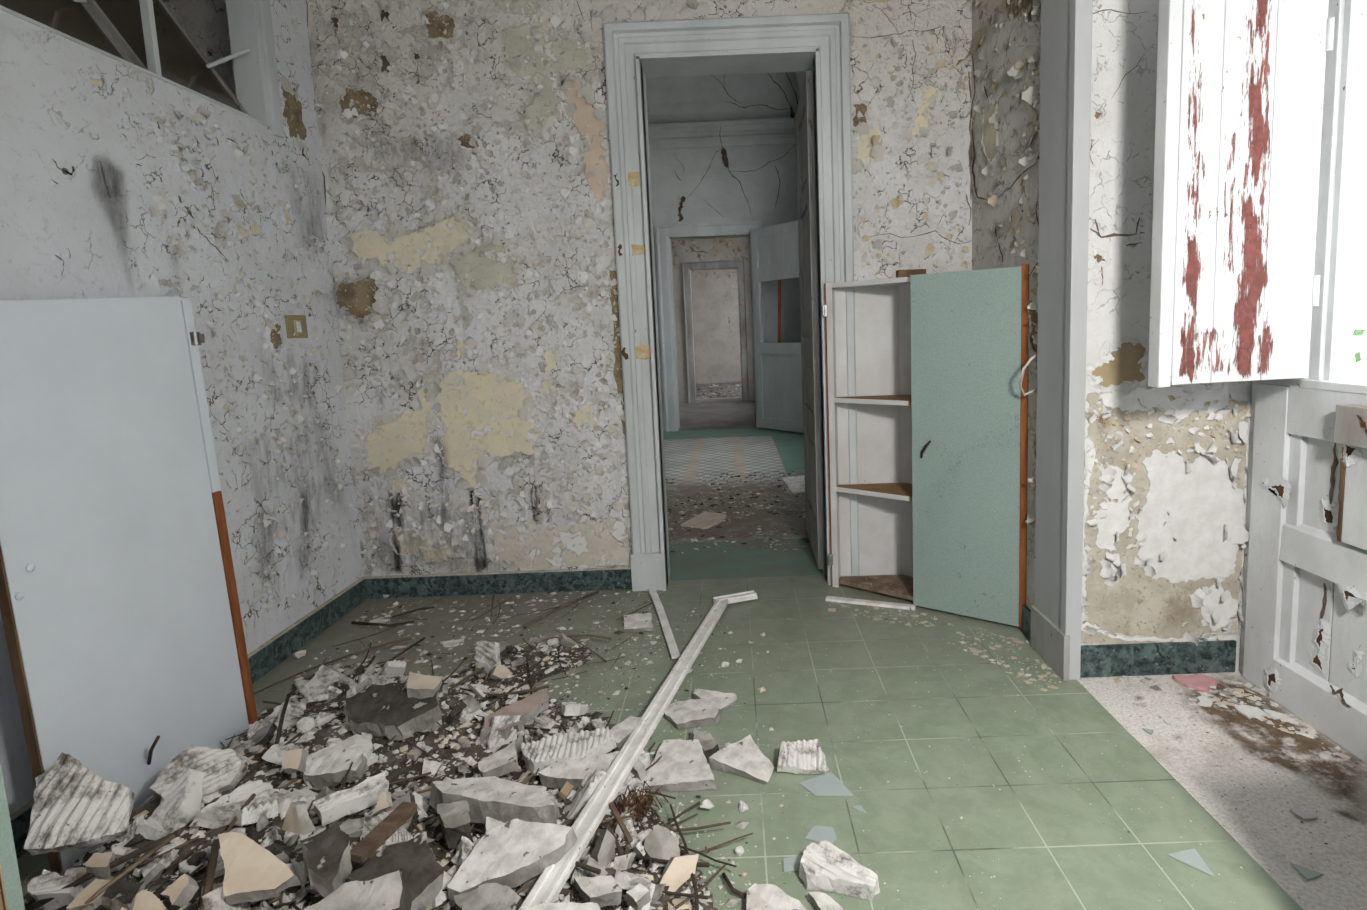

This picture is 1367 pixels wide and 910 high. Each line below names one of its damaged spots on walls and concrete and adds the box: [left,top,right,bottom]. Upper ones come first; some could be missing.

peeling [135,0,632,614]
water stain [391,496,401,571]
crack [673,72,798,217]
peeling [851,0,1041,379]
peeling [1025,430,1036,524]
peeling [1081,0,1273,646]